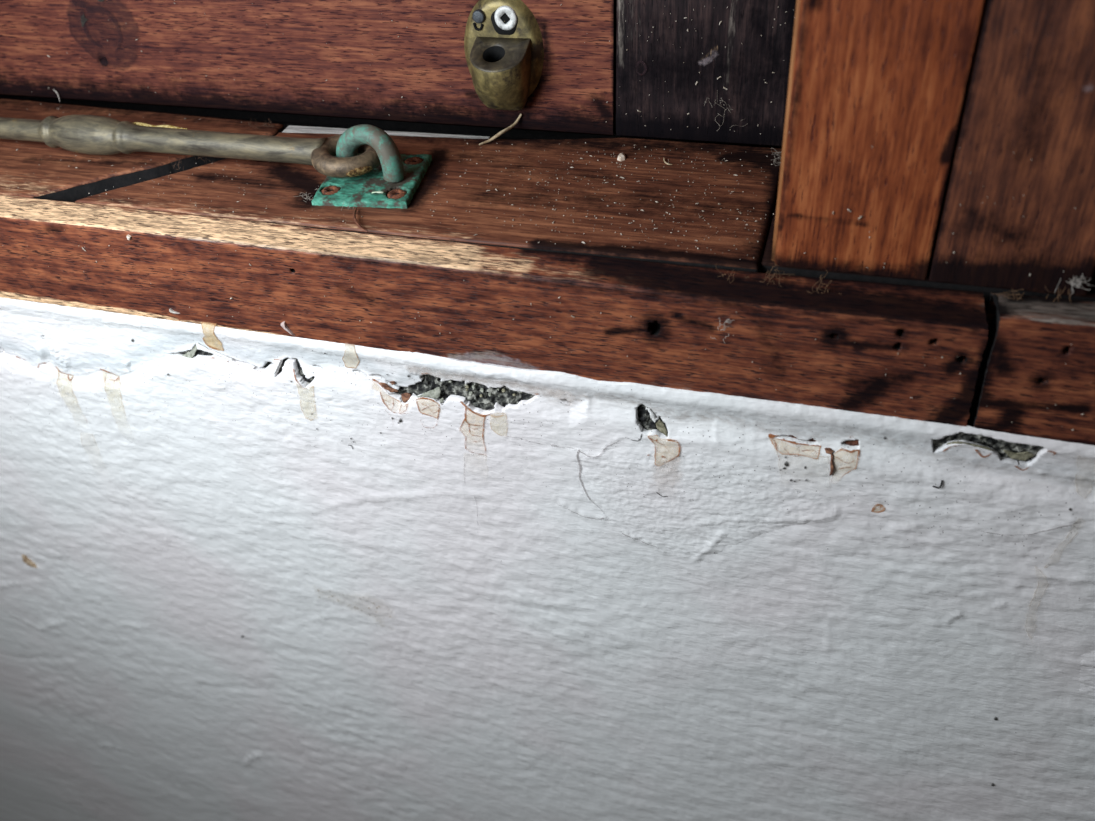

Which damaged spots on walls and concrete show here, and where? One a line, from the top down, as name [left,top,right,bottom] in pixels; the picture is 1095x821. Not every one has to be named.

peeling [178,342,233,360]
peeling [263,358,315,386]
peeling [372,373,538,417]
peeling [637,404,668,437]
peeling [768,434,834,476]
peeling [933,432,1056,471]
crack [529,434,644,543]